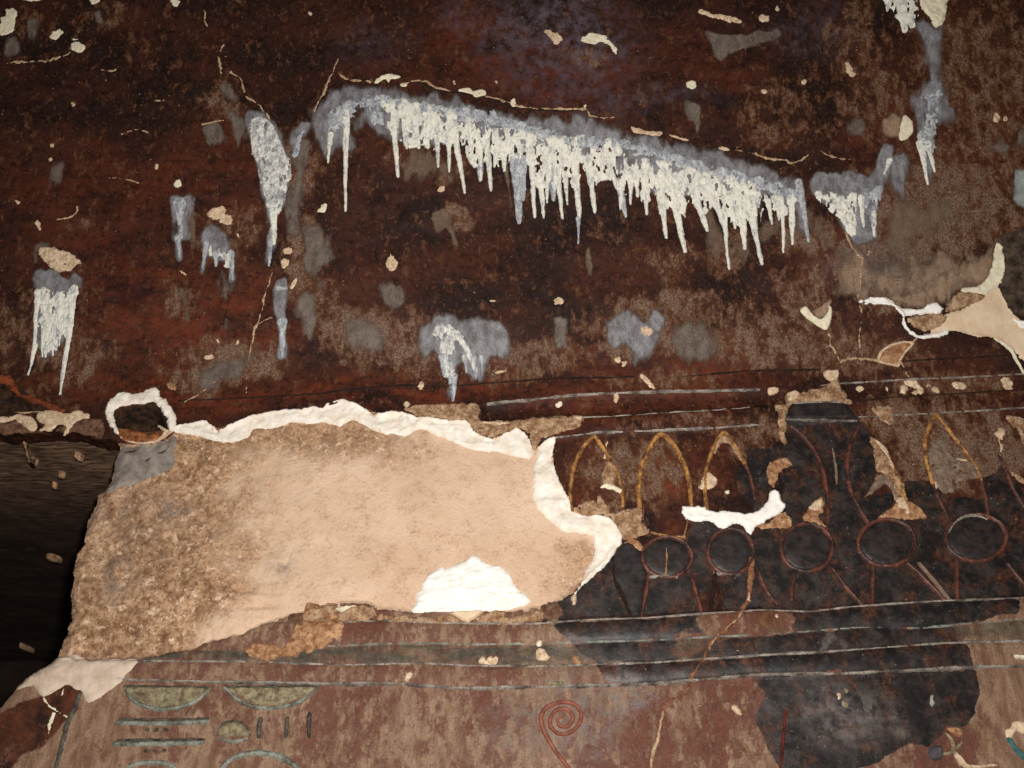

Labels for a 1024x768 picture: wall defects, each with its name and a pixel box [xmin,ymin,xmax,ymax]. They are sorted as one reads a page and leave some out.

crack [313,58,688,141]
damp [202,0,955,366]
crack [718,147,850,164]
damp [170,194,236,297]
corrosion [0,375,65,413]
damp [27,242,83,395]
damp [418,314,511,402]
flaking render [800,228,1024,374]
flaking render [0,381,595,661]
flaking render [564,461,650,551]
flaking render [699,472,730,494]
crack [650,557,755,768]